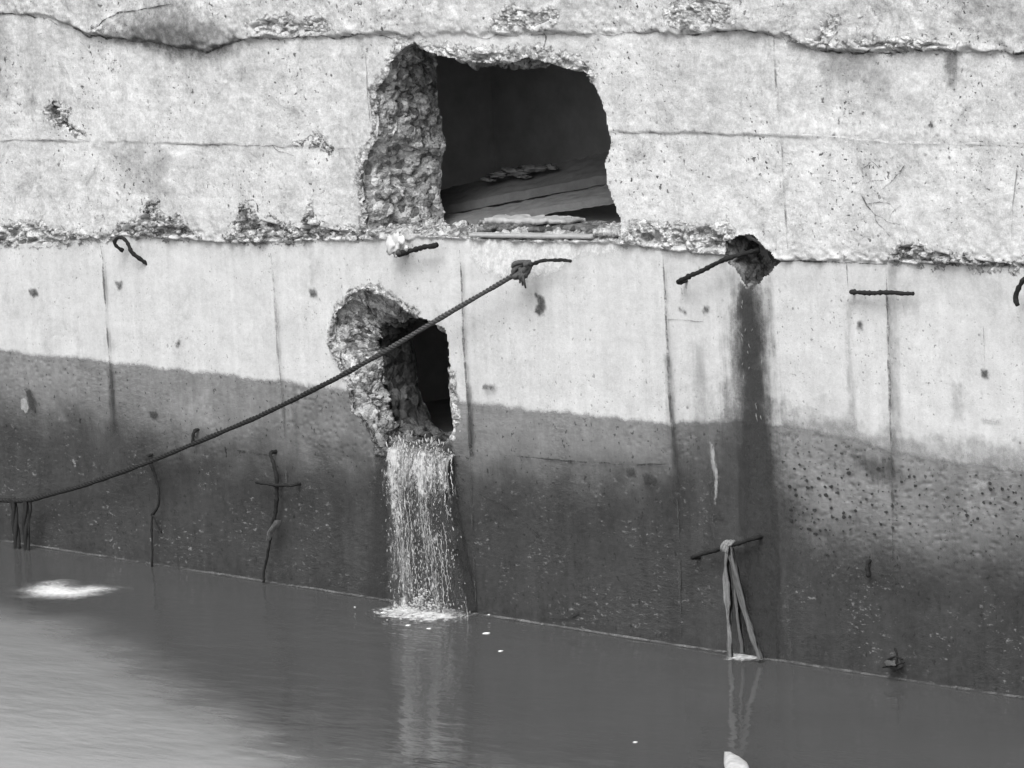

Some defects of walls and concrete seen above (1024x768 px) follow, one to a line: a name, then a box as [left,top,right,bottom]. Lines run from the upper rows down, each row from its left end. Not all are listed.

crack [0,4,395,54]
spalling [42,98,86,138]
spalling [222,0,780,290]
spalling [0,198,202,250]
spalling [887,239,1024,277]
spalling [327,280,461,463]
damp [0,282,1024,699]